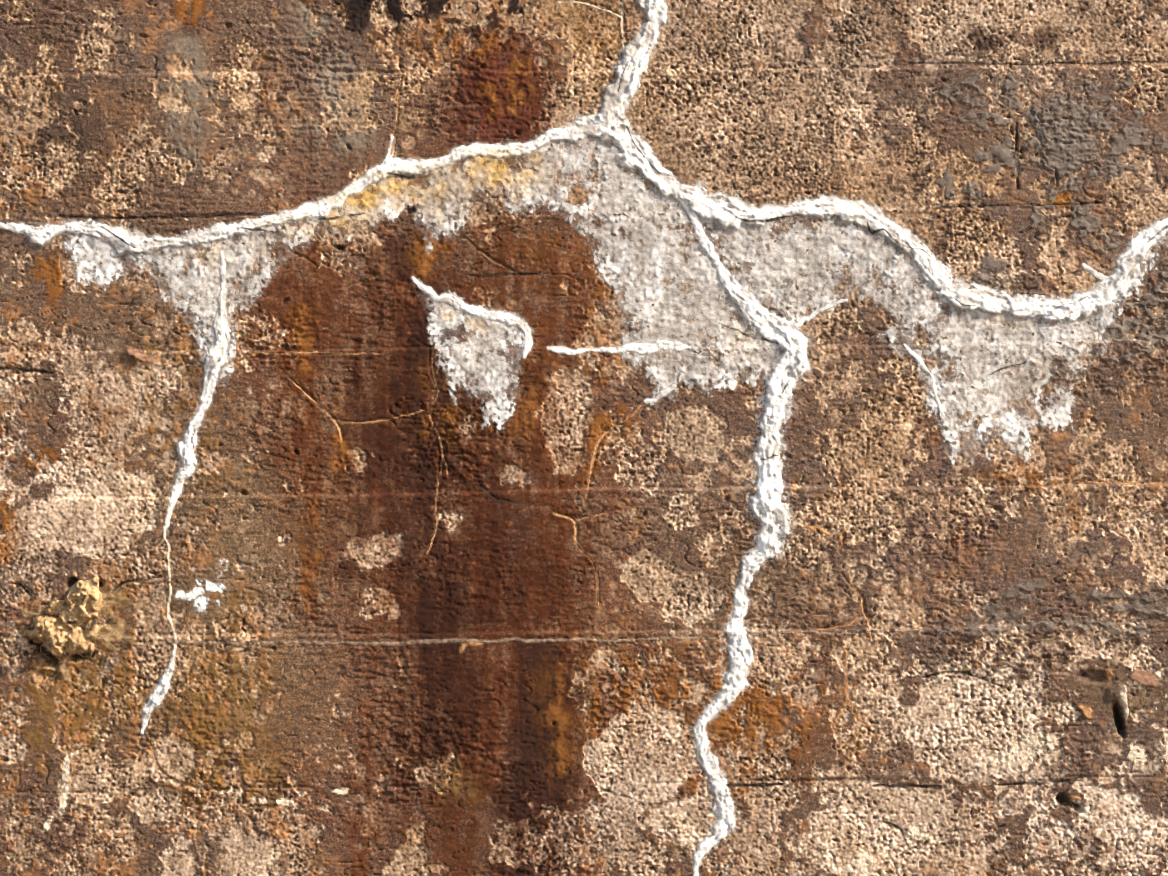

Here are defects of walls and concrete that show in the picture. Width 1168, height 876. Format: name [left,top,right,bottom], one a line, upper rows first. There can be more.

rust [460,35,540,145]
crack [0,0,1168,323]
water stain [64,136,1168,464]
crack [0,366,53,374]
crack [224,351,642,606]
crack [677,197,848,876]
crack [14,583,36,599]
crack [818,573,873,640]
rust [686,676,784,749]
crack [926,671,996,685]
crack [872,782,945,790]
crack [997,778,1082,786]